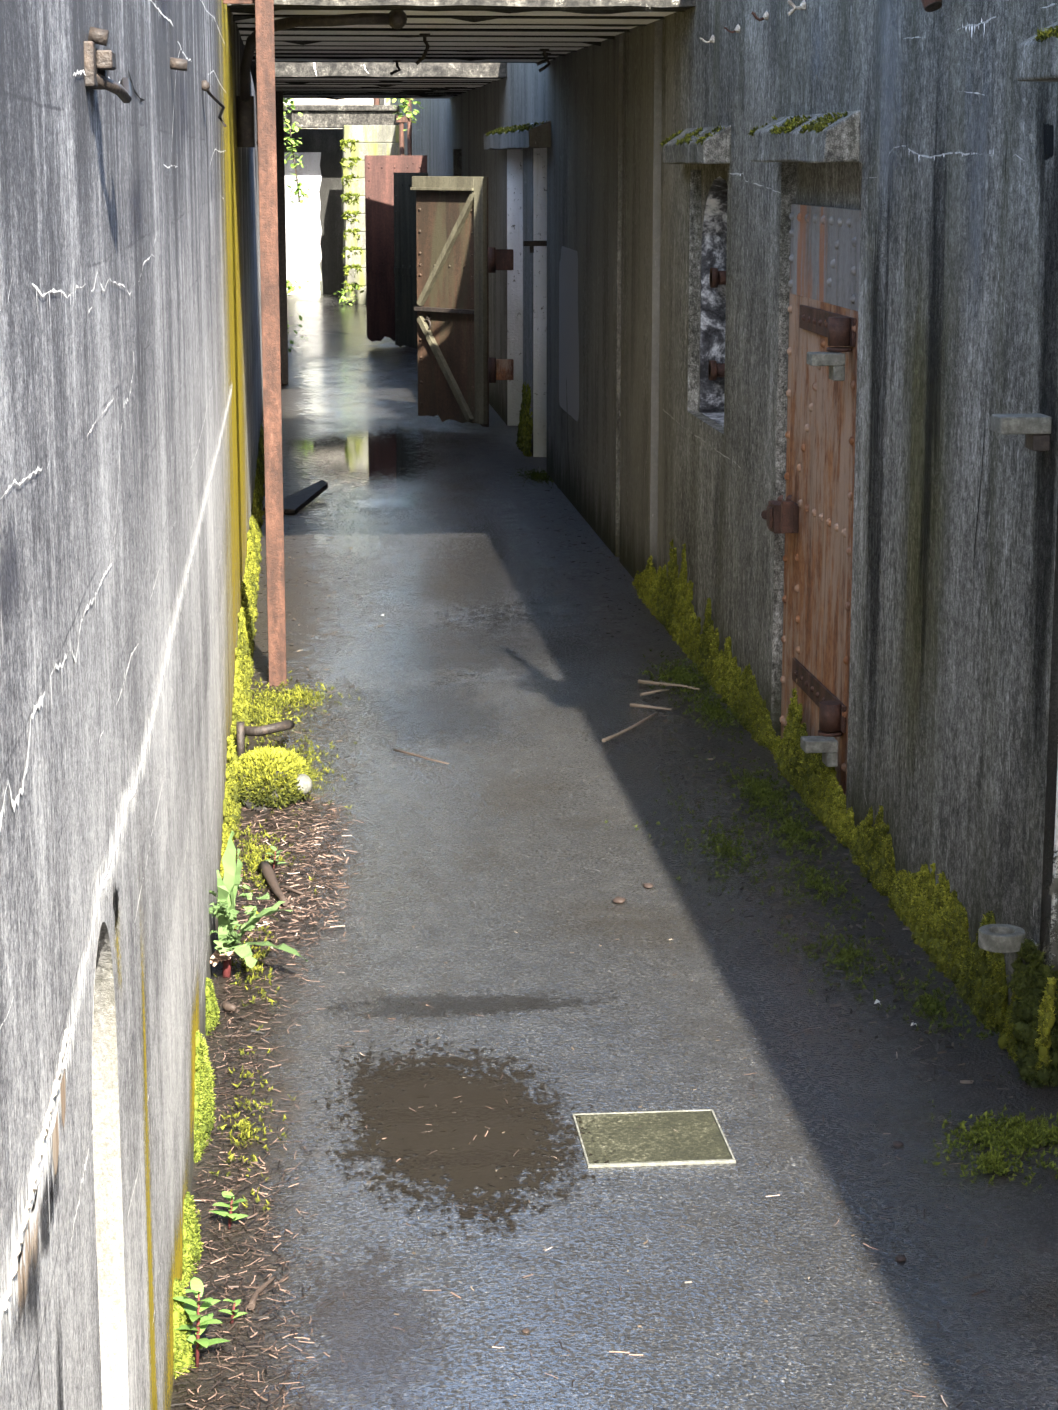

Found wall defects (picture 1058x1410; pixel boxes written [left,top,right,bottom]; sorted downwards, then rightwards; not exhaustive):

crack [0,337,232,1368]
peeling [1042,848,1058,974]